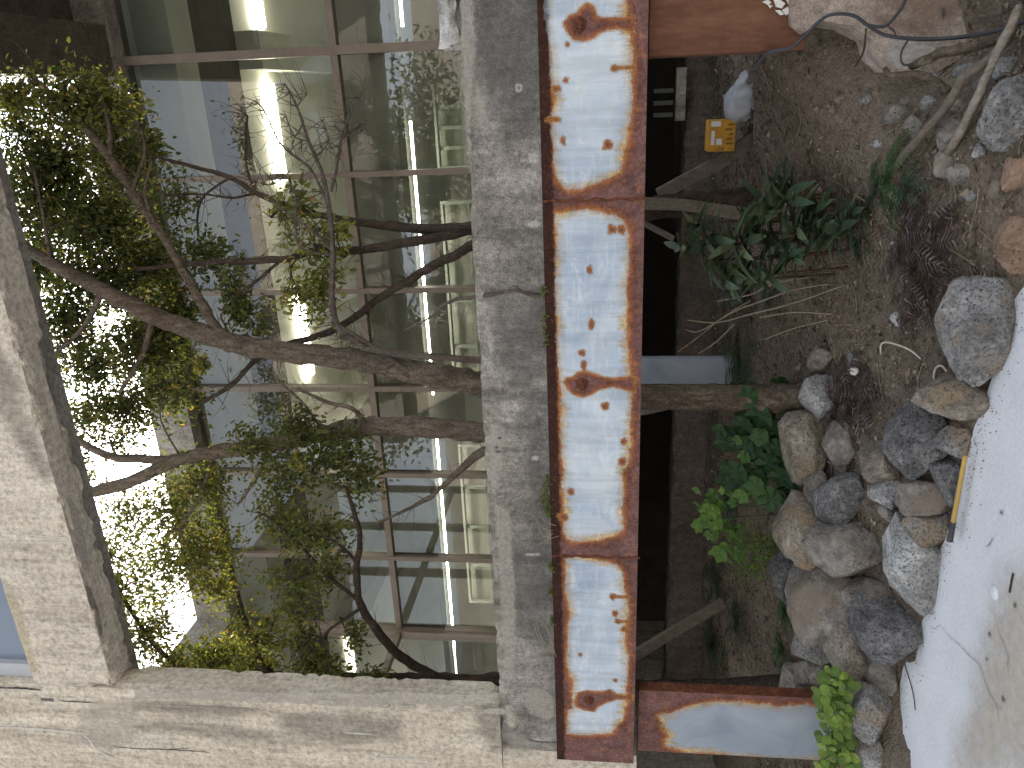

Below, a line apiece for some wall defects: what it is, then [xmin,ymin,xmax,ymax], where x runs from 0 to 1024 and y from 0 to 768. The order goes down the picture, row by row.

corrosion [537,0,820,764]